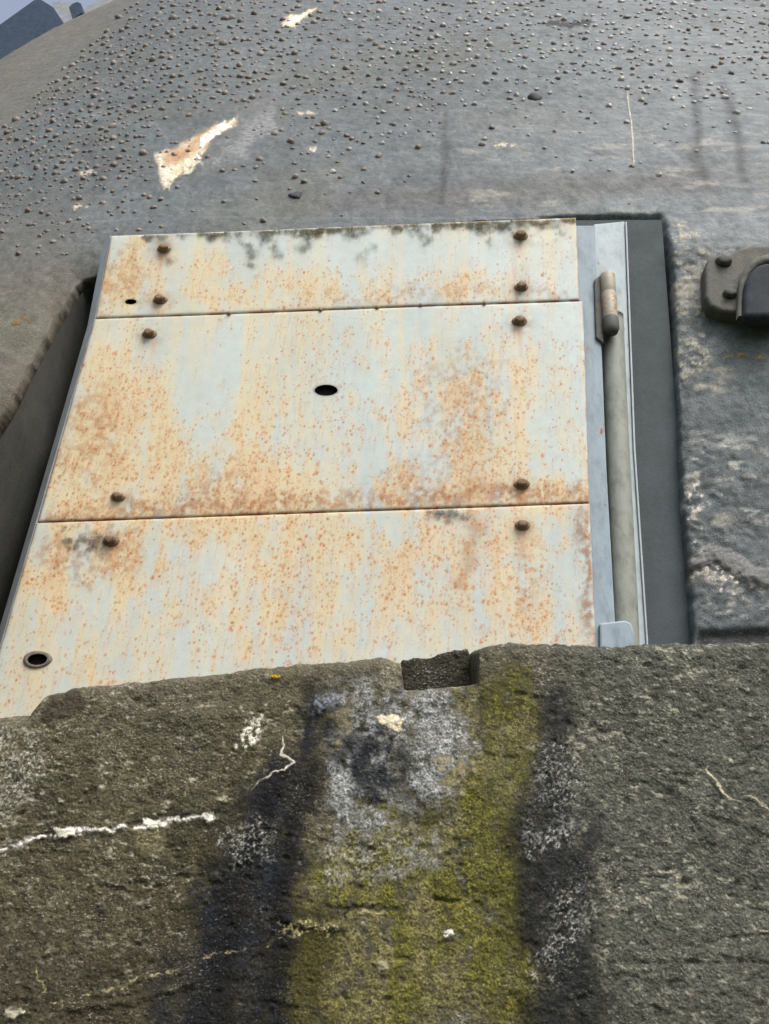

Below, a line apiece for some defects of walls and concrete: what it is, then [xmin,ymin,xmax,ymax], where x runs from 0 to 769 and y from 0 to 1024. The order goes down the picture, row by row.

spalling [154,119,237,188]
crack [0,737,295,851]
damp [154,683,343,1024]
damp [325,834,417,882]
damp [492,689,609,1024]